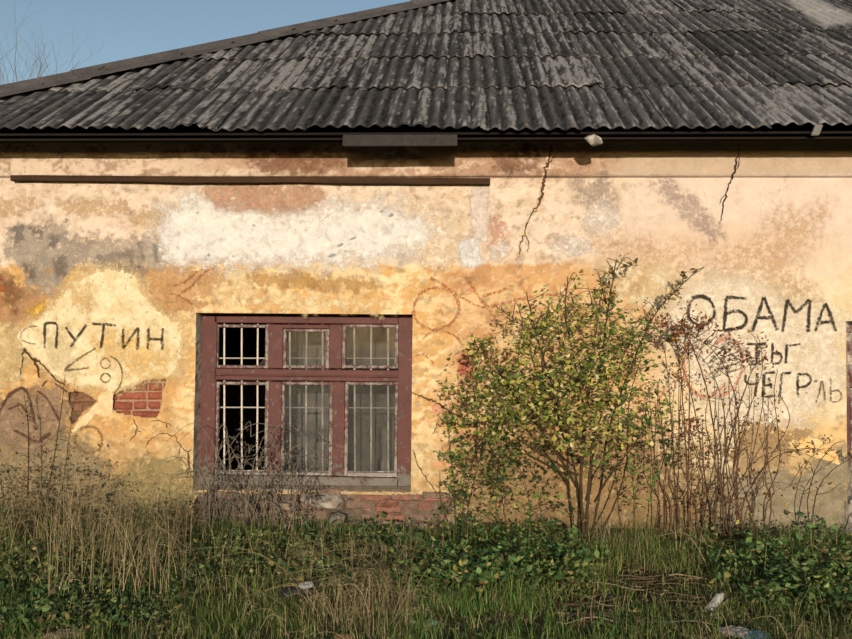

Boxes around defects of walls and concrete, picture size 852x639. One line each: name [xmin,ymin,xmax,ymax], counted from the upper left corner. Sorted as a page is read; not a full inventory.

crack [516,145,557,258]
crack [720,145,740,219]
flaking render [0,261,195,433]